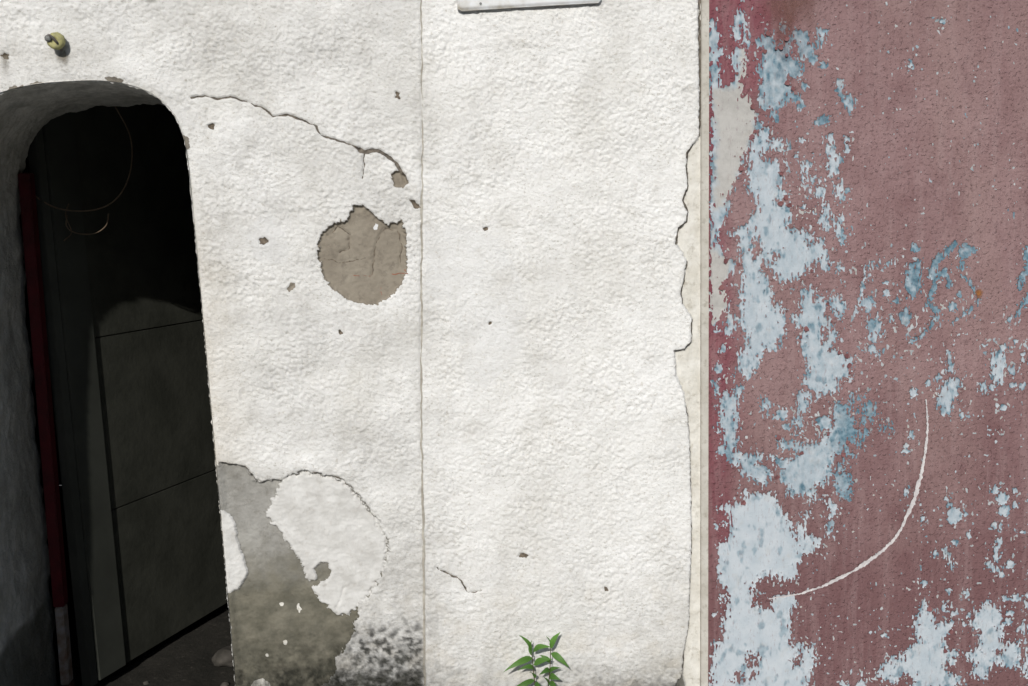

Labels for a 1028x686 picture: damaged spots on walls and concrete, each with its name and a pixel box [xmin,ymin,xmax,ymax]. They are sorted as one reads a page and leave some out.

crack [190,0,478,686]
flaking render [317,205,408,306]
flaking render [391,171,421,209]
peeling [675,0,1028,686]
flaking render [216,462,390,686]
water stain [235,631,423,686]